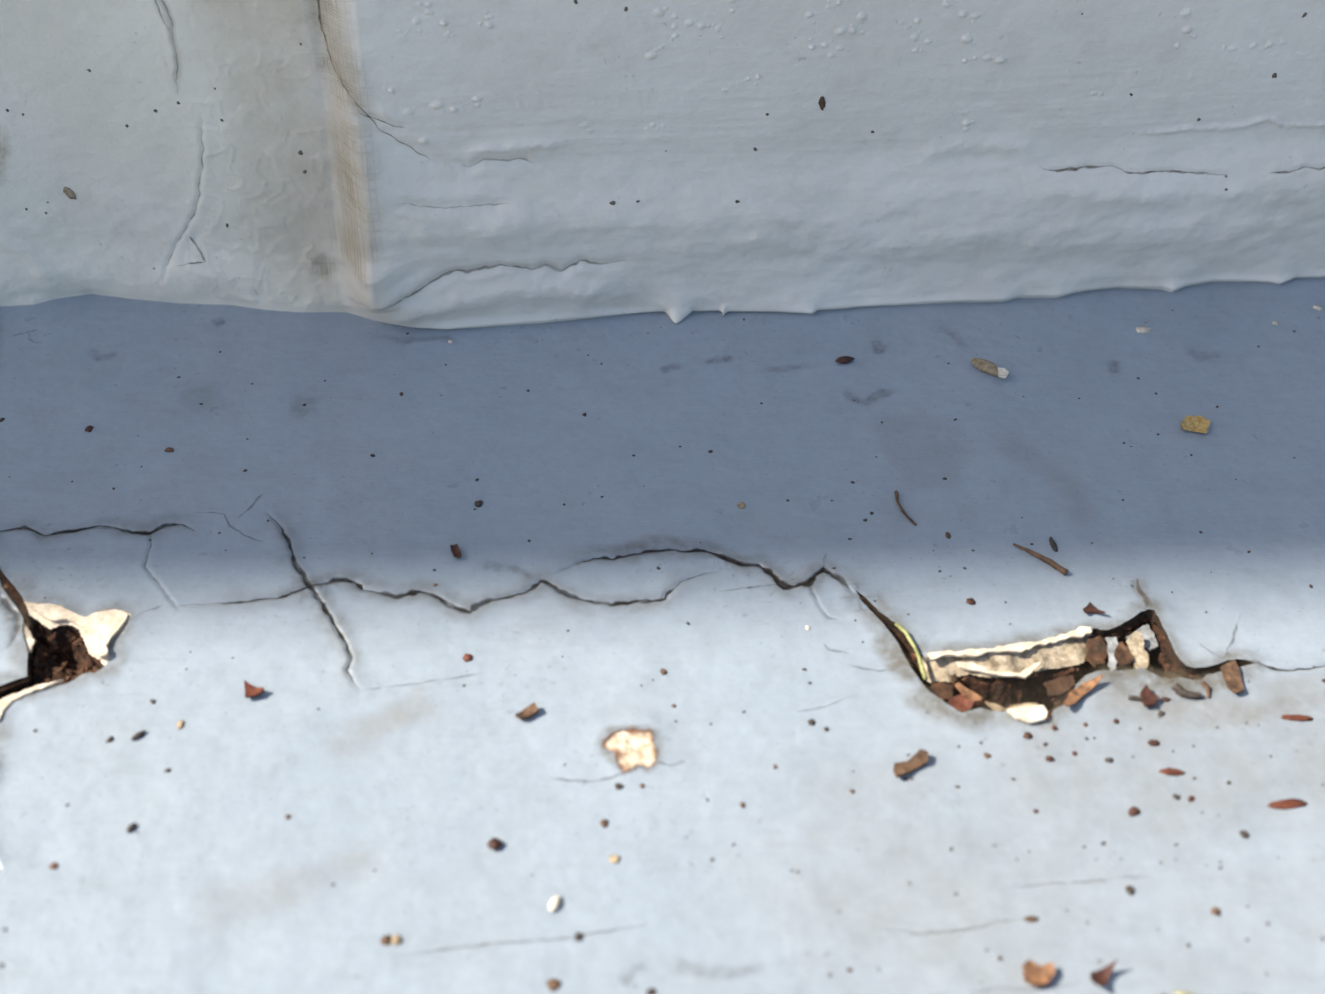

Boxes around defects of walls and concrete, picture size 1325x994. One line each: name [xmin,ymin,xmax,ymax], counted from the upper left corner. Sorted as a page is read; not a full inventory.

crack [1054,166,1191,174]
crack [399,264,531,302]
crack [0,524,190,536]
crack [221,520,846,681]
spalling [0,568,131,720]
spalling [856,591,1255,719]
spalling [602,728,657,772]